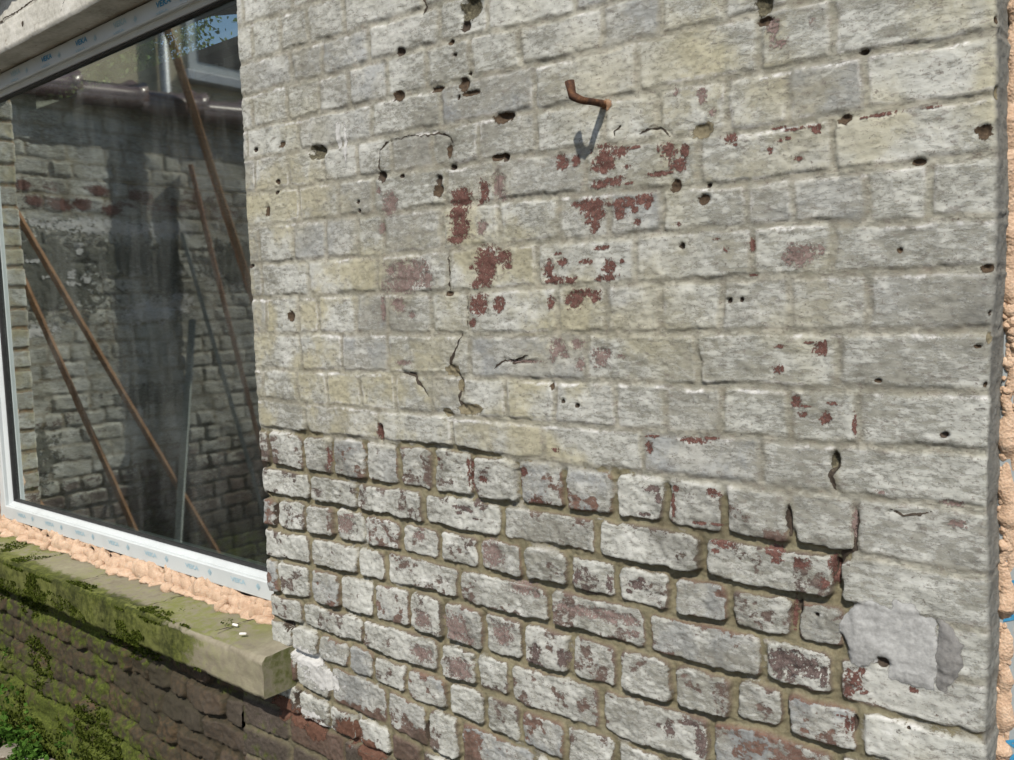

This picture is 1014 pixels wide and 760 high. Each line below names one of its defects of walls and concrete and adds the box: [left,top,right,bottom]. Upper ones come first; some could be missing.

peeling [647,87,738,193]
peeling [556,143,654,234]
peeling [540,245,624,310]
crack [404,372,429,396]
crack [448,257,469,409]
crack [494,355,536,369]
peeling [452,458,488,520]
crack [828,453,841,490]
crack [840,510,860,569]
crack [890,509,932,517]
peeling [271,694,390,760]
peeling [656,719,711,759]